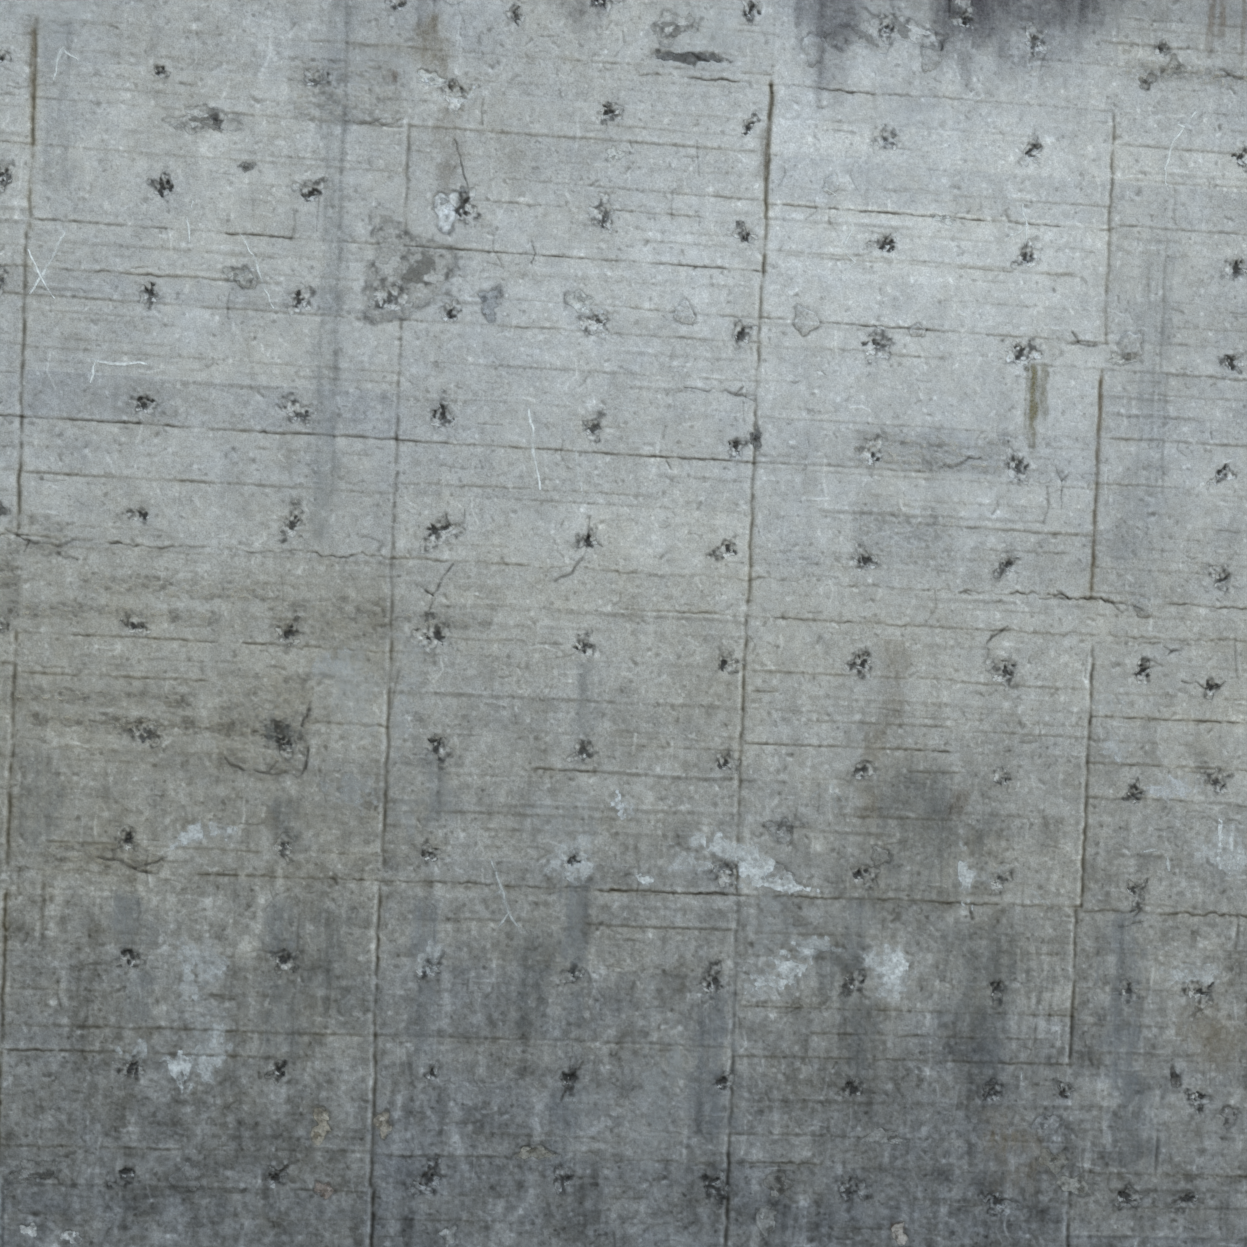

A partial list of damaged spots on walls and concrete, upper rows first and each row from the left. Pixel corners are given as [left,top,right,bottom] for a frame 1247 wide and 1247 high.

spalling [651,10,722,66]
water stain [944,0,1019,36]
spalling [434,193,474,231]
spalling [367,223,453,322]
corrosion [1029,365,1044,429]
water stain [550,840,593,954]
water stain [636,874,654,885]
water stain [675,832,820,904]
water stain [745,936,840,994]
water stain [863,944,909,998]
water stain [164,1024,231,1092]